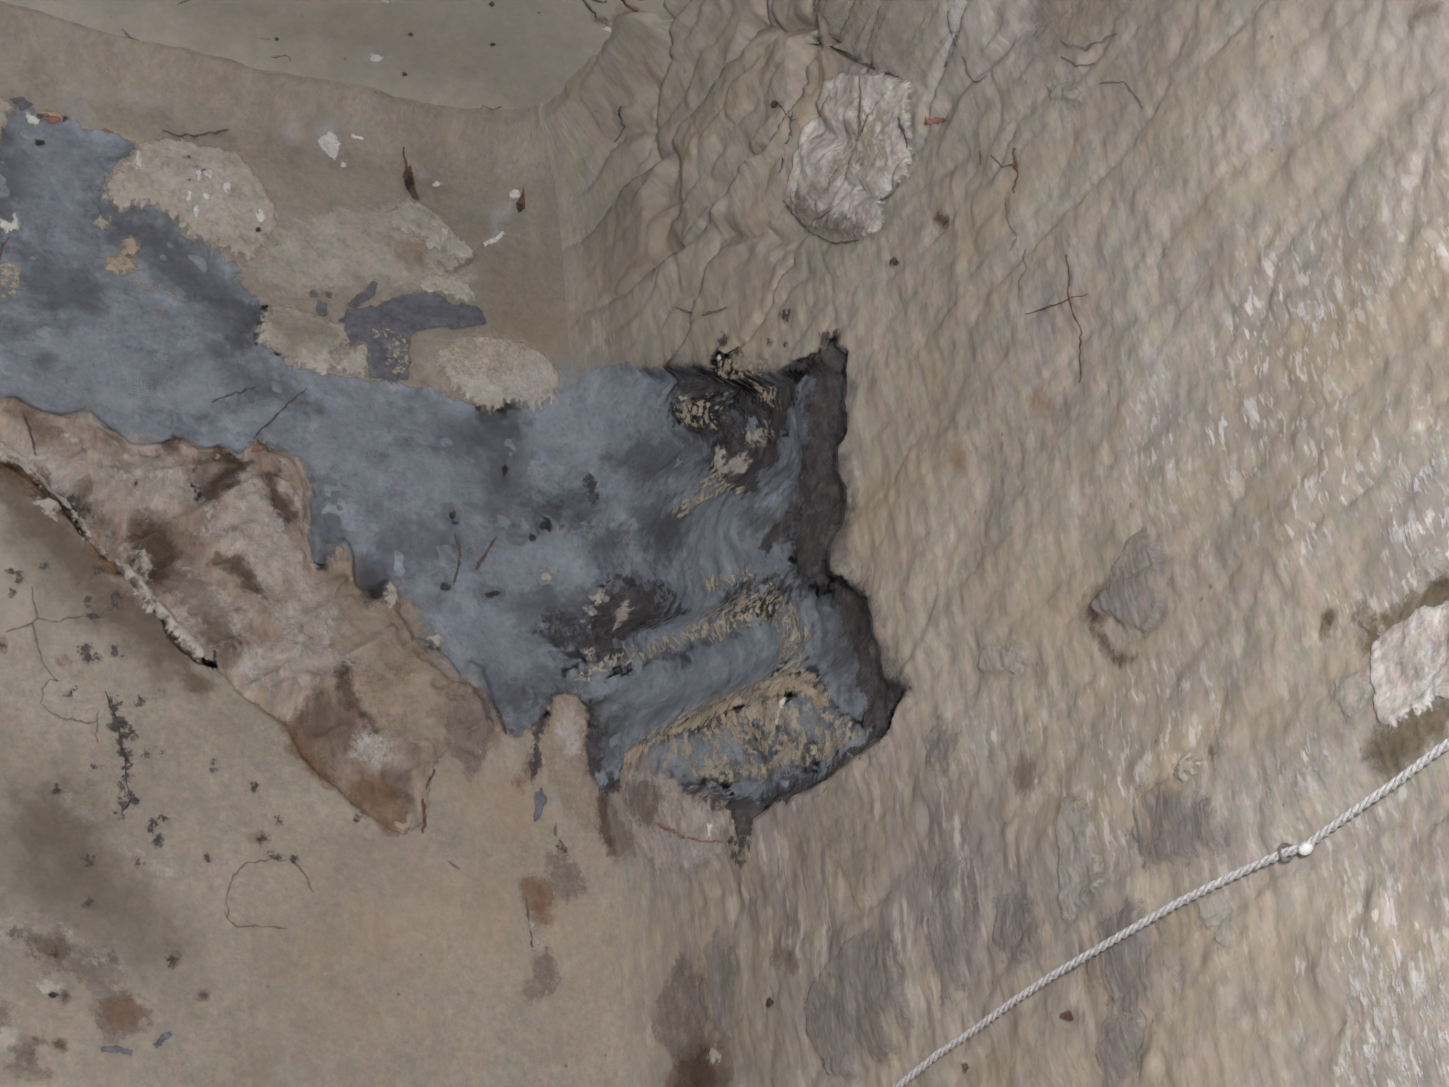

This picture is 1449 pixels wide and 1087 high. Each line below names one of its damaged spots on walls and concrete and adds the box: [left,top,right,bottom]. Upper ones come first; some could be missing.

flaking render [0,97,911,876]